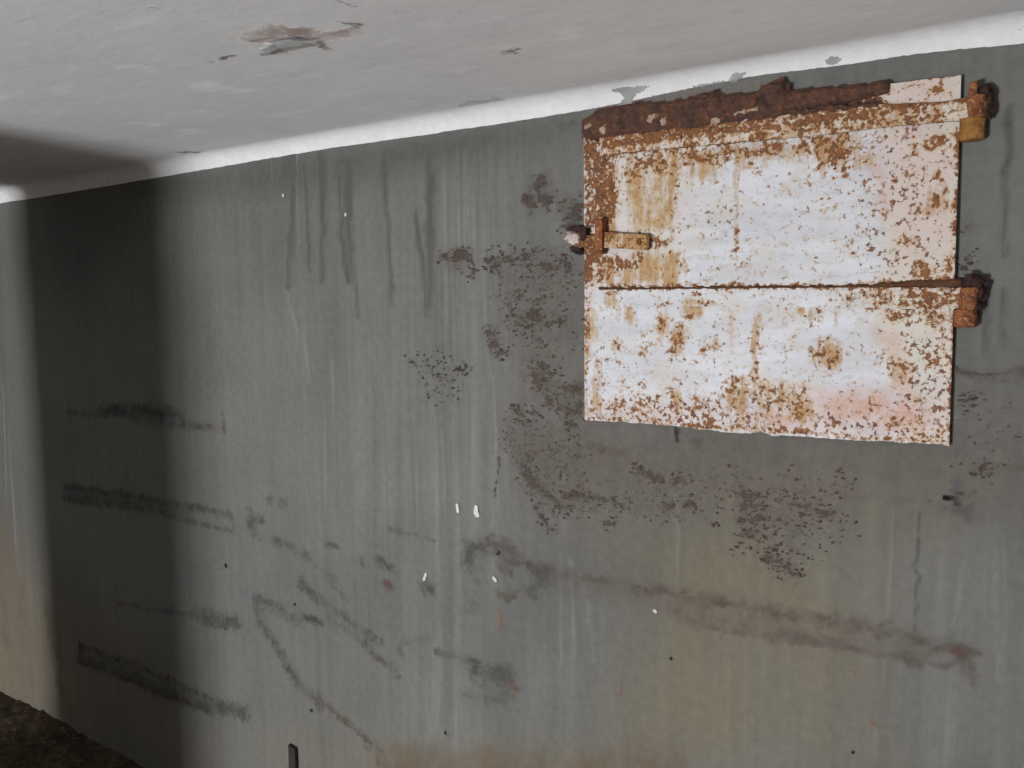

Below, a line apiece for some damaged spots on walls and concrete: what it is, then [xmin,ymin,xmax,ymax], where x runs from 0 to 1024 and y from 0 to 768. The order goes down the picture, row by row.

peeling [240,21,362,56]
peeling [612,72,763,106]
corrosion [582,77,891,142]
water stain [287,154,326,289]
water stain [339,158,353,283]
corrosion [599,279,963,290]